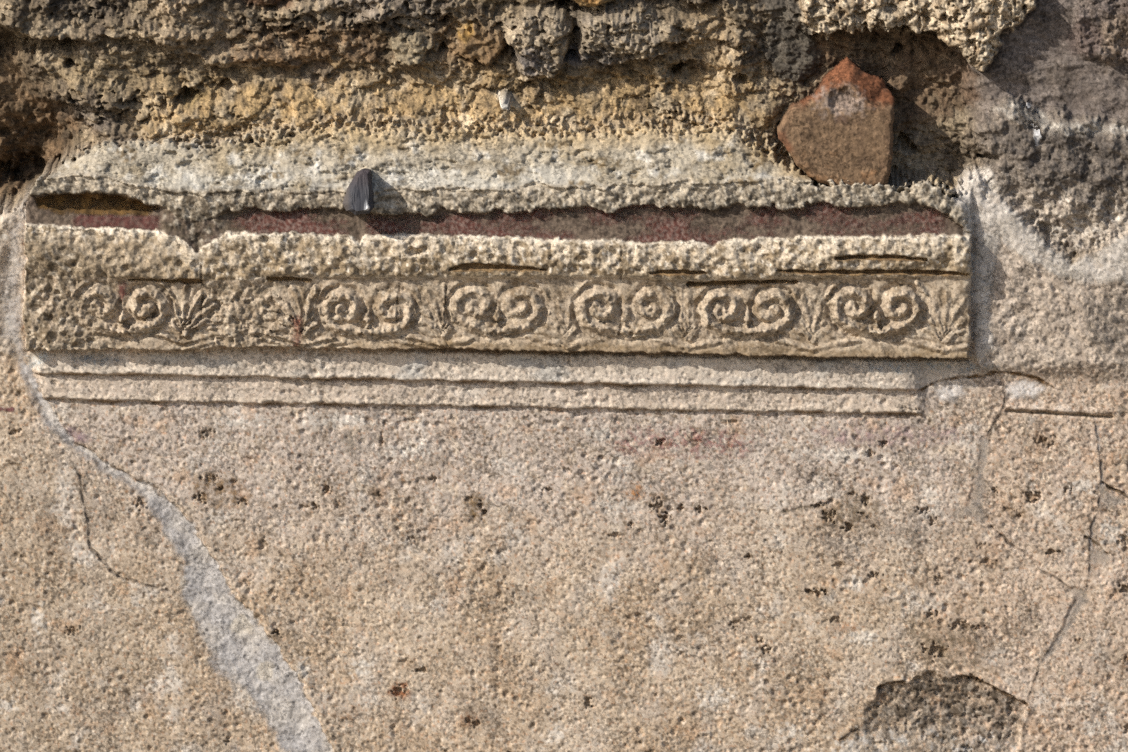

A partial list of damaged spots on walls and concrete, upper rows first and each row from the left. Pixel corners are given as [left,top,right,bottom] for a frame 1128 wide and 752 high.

peeling [74,215,158,230]
peeling [234,168,374,235]
peeling [626,205,784,244]
peeling [798,202,943,235]
crack [3,208,333,752]
crack [921,371,1054,552]
crack [1035,417,1126,681]
spalling [840,675,1028,752]